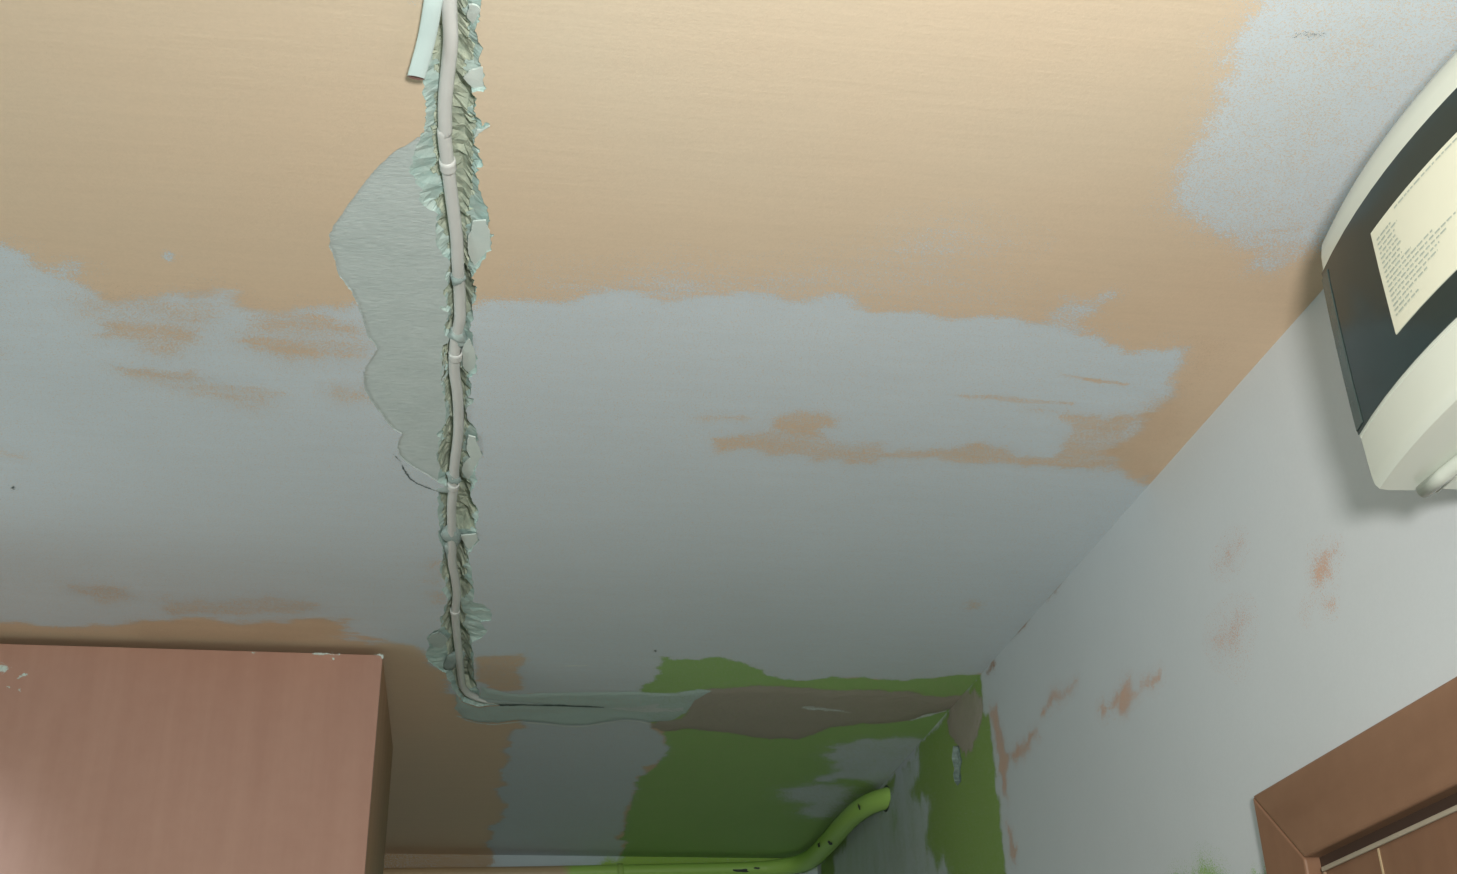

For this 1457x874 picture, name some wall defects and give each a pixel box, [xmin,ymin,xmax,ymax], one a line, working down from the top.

peeling [329,0,499,707]